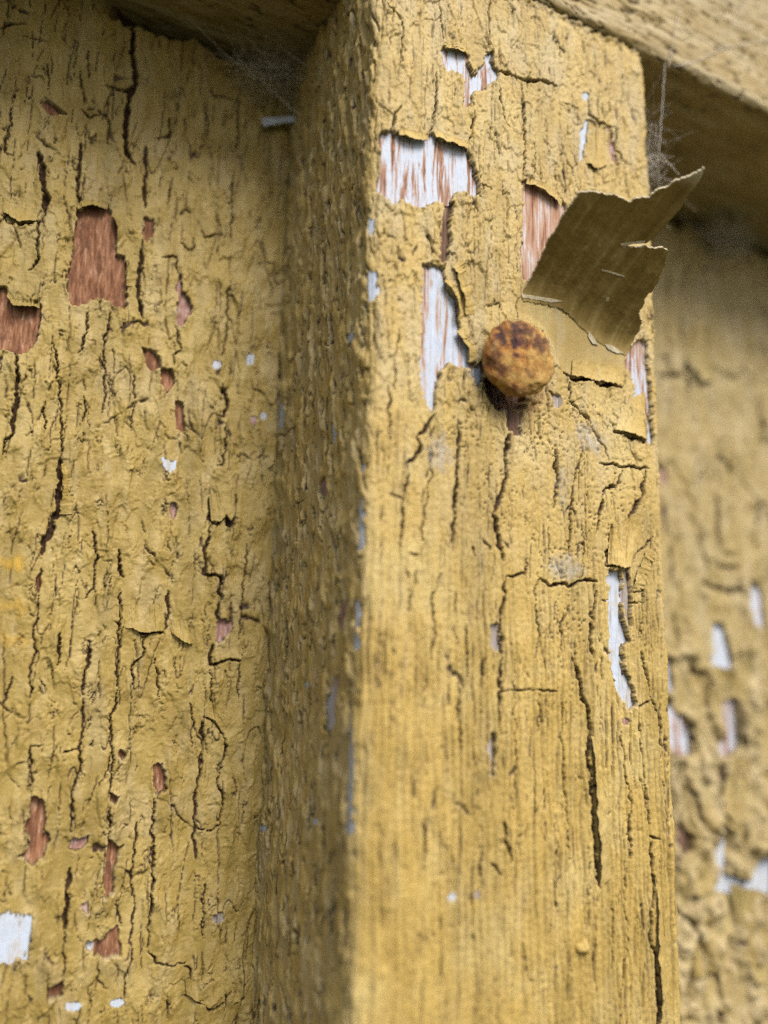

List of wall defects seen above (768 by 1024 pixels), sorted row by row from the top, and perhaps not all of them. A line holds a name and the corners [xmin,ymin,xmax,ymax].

peeling [0,289,41,354]
crack [33,154,48,267]
peeling [67,200,132,309]
peeling [399,127,470,150]
crack [565,375,617,388]
peeling [520,167,705,385]
crack [2,313,111,707]
peeling [21,785,49,864]
crack [66,641,90,832]
crack [86,531,169,786]
crack [96,802,209,1009]
crack [189,645,239,858]